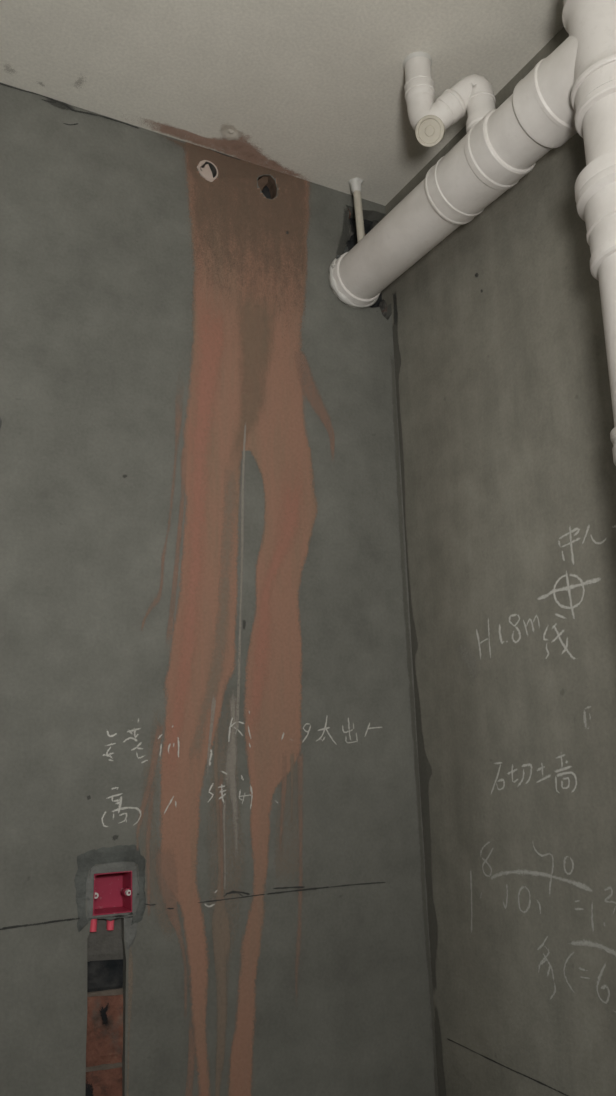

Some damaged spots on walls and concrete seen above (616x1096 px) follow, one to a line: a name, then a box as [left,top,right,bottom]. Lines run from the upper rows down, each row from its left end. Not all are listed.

corrosion [136,141,335,1096]